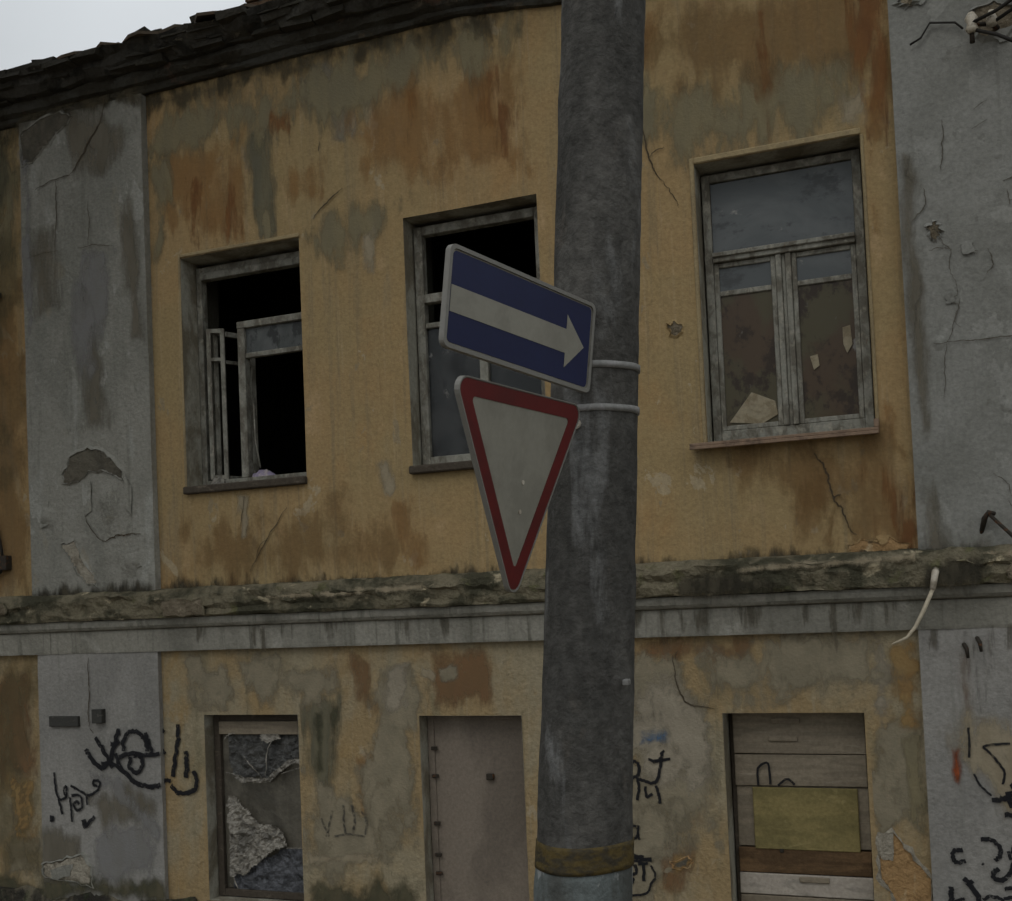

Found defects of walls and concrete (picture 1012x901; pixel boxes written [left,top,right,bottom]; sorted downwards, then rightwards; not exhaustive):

spalling [969,0,1012,44]
water stain [0,131,56,328]
crack [26,99,104,259]
water stain [121,199,141,337]
water stain [17,10,521,260]
crack [643,131,678,204]
water stain [642,50,864,169]
peeling [61,445,132,516]
crack [814,453,857,535]
water stain [959,711,1012,813]
water stain [311,878,415,901]
spalling [875,827,933,901]